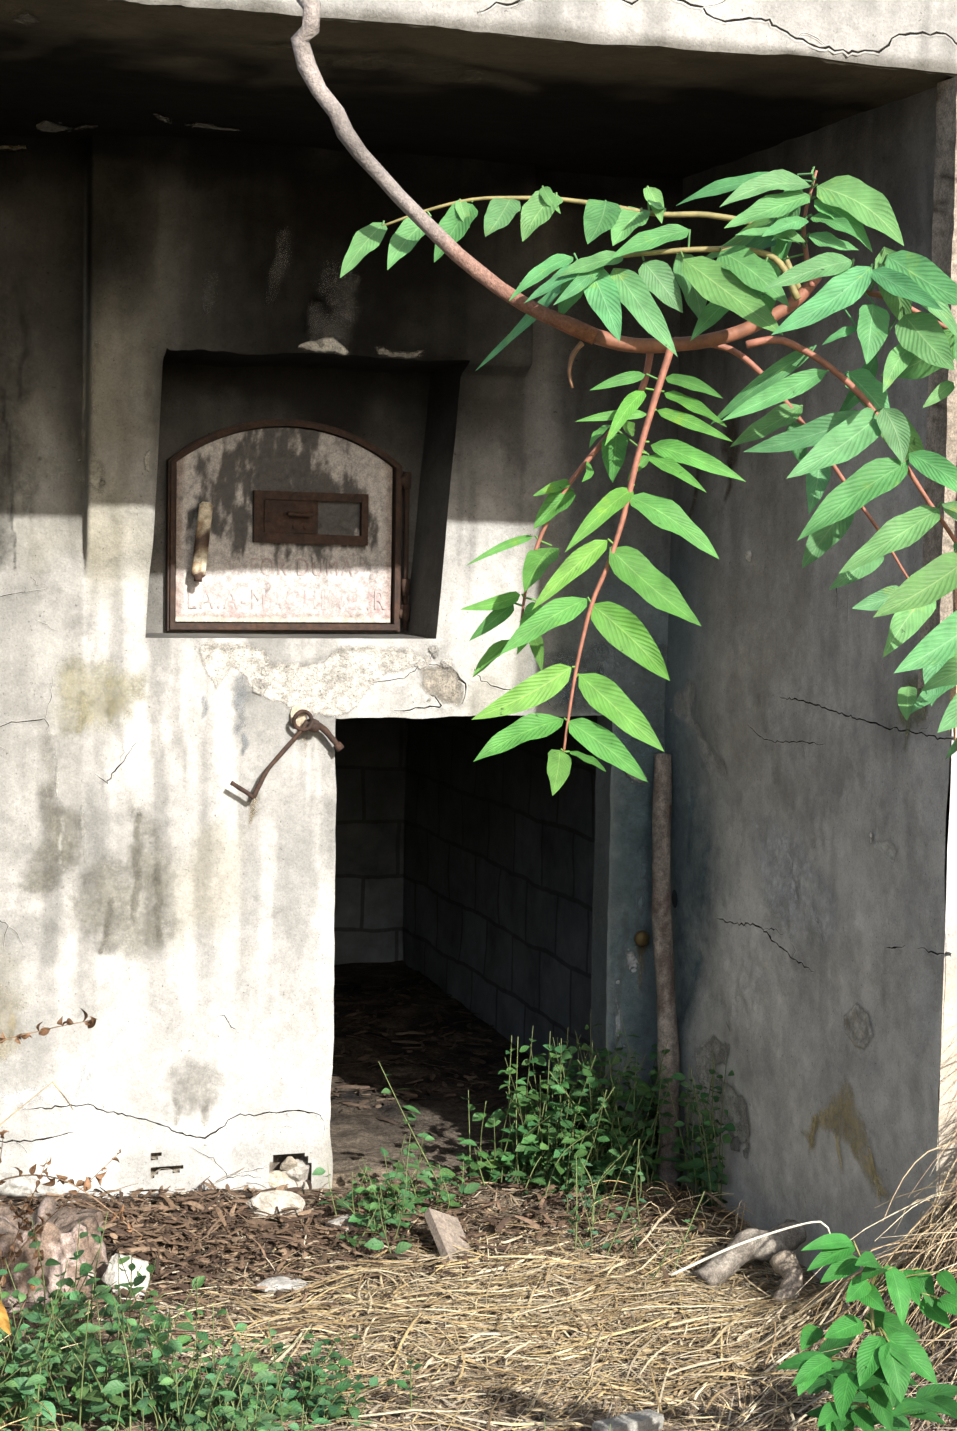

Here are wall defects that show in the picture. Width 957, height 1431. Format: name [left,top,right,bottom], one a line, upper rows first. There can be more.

crack [477,0,552,15]
crack [616,0,957,57]
spalling [200,641,462,716]
crack [748,695,957,759]
water stain [29,767,86,890]
water stain [84,815,168,953]
crack [716,916,814,973]
crack [0,1102,325,1179]